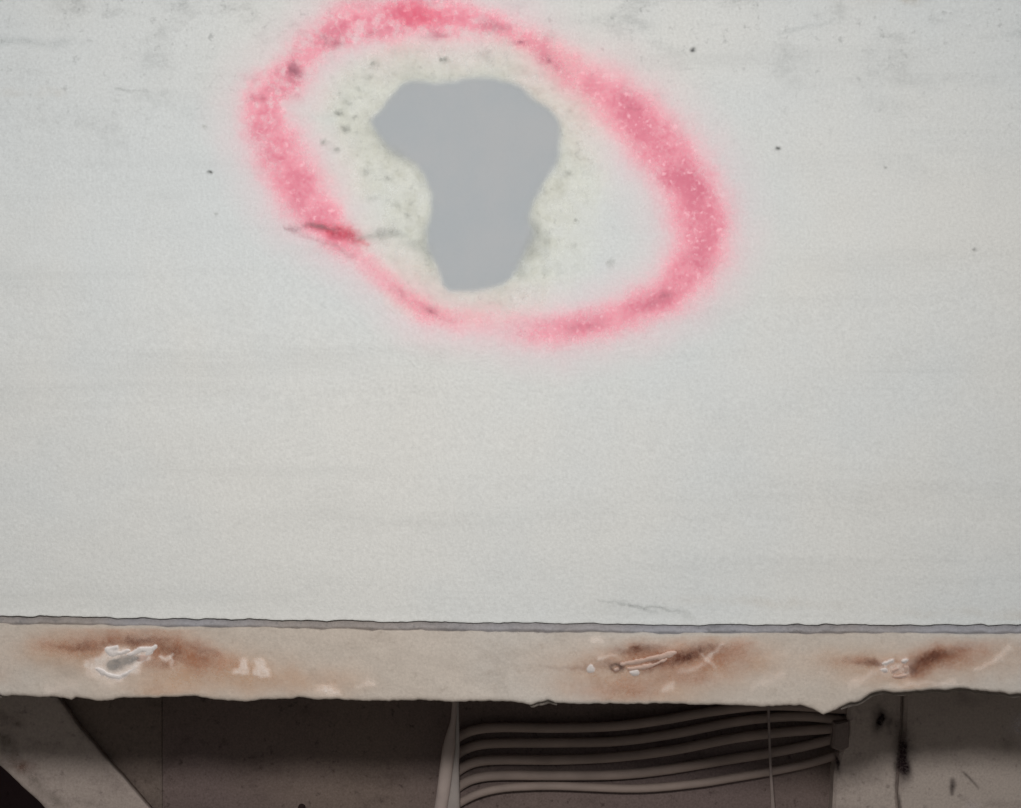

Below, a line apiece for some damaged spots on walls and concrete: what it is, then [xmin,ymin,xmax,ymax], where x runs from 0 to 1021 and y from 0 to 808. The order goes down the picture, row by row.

spalling [337,47,586,314]
spalling [85,643,158,681]
rust [632,646,721,670]
rust [909,649,960,675]